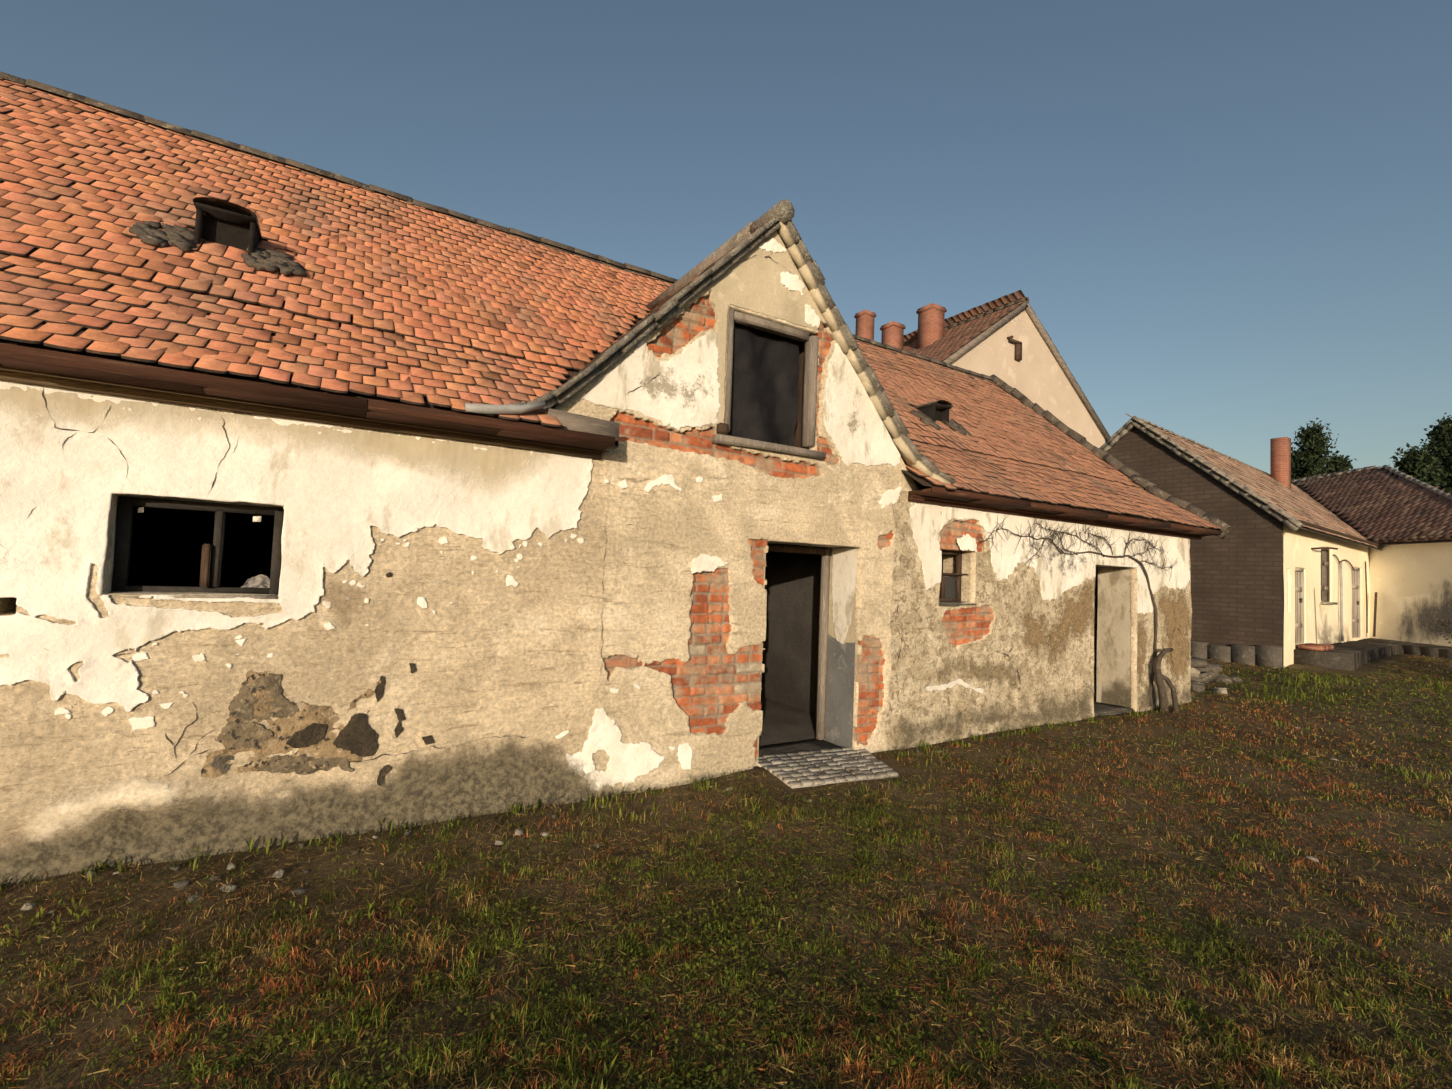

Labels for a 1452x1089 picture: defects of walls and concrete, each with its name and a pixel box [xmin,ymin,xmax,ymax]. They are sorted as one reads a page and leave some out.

peeling [758,238,787,253]
flaking render [0,271,839,851]